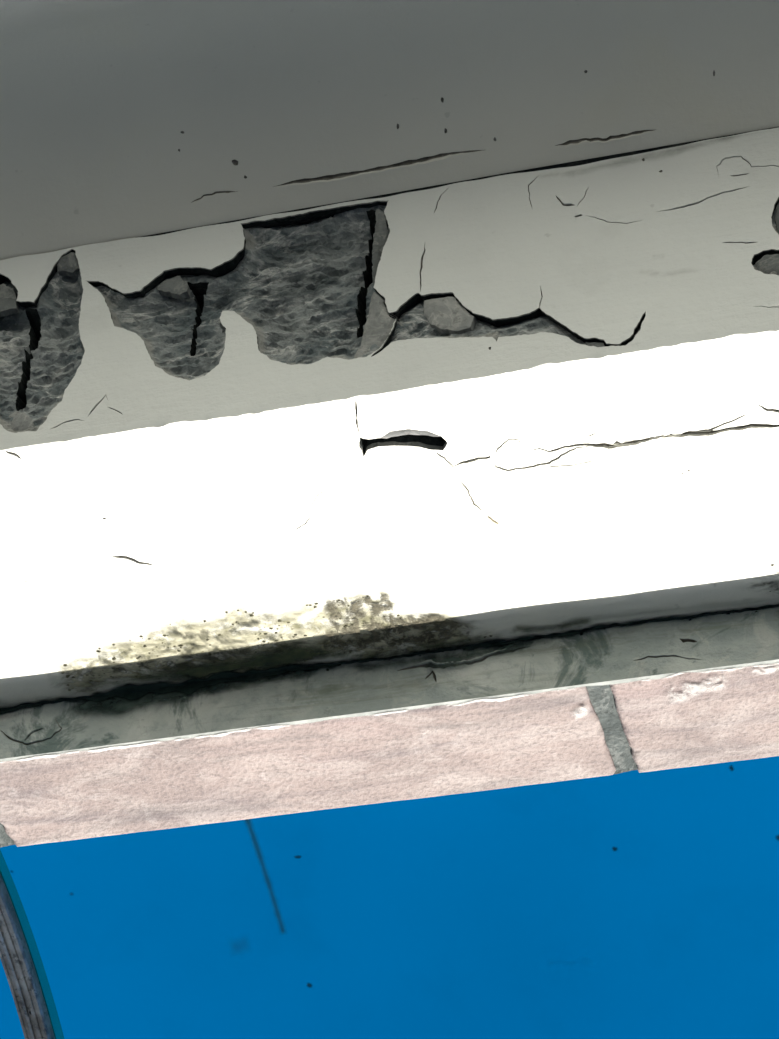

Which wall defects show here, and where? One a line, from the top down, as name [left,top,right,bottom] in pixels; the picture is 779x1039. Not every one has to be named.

spalling [0,201,646,433]
crack [136,127,779,238]
spalling [751,249,779,275]
spalling [771,197,779,234]
spalling [359,429,447,457]
crack [435,404,779,524]
leakage [0,594,779,715]